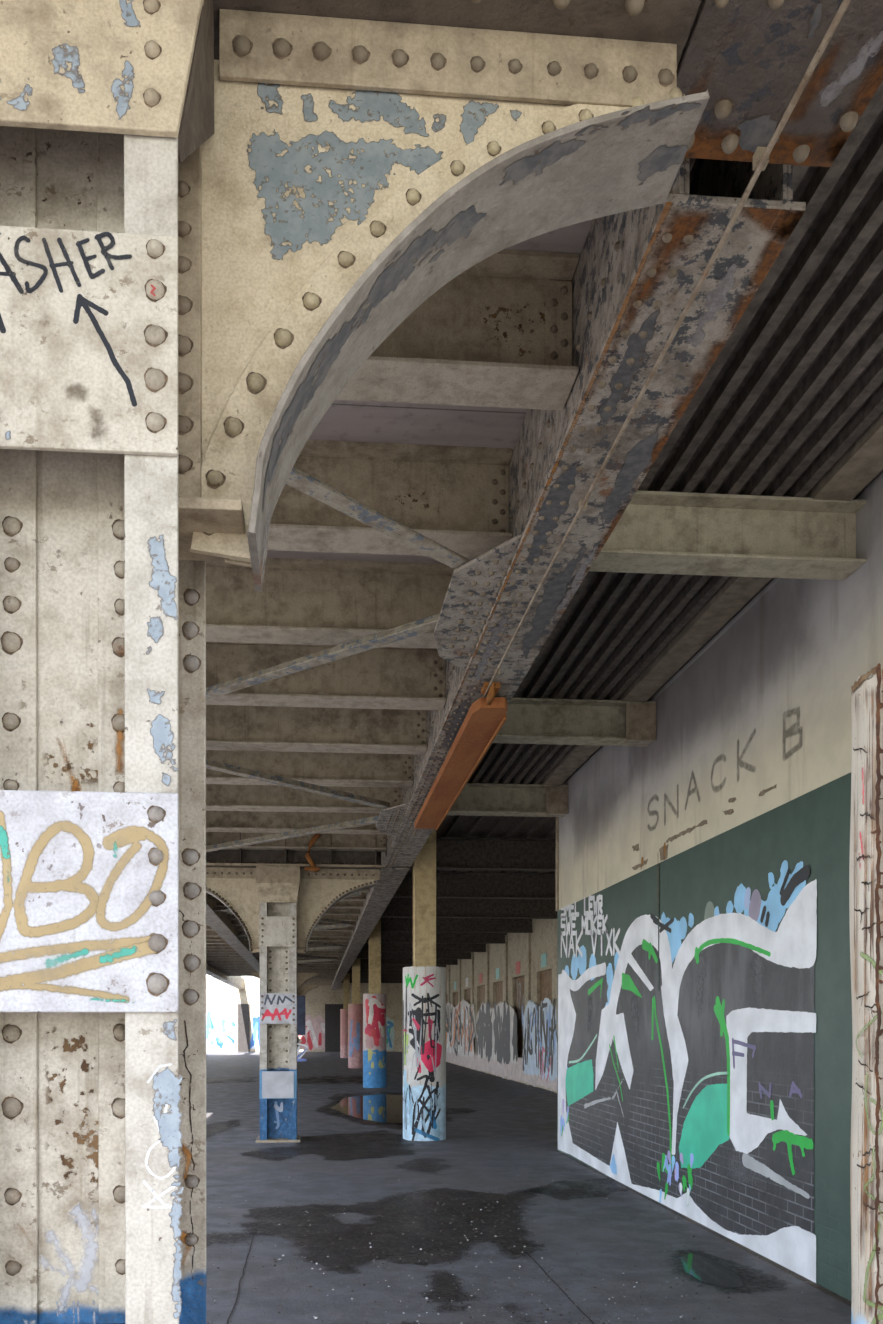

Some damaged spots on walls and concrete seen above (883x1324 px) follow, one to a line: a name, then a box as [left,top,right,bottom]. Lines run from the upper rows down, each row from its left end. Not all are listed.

peeling [246,83,522,260]
corrosion [684,61,883,167]
corrosion [645,207,805,473]
corrosion [444,202,707,725]
peeling [144,534,178,655]
peeling [146,688,178,786]
corrosion [47,1030,98,1187]
peeling [152,1067,184,1319]
crack [179,910,203,1279]
crack [226,1219,259,1324]
leakage [206,1075,632,1312]
leakage [669,1249,790,1294]